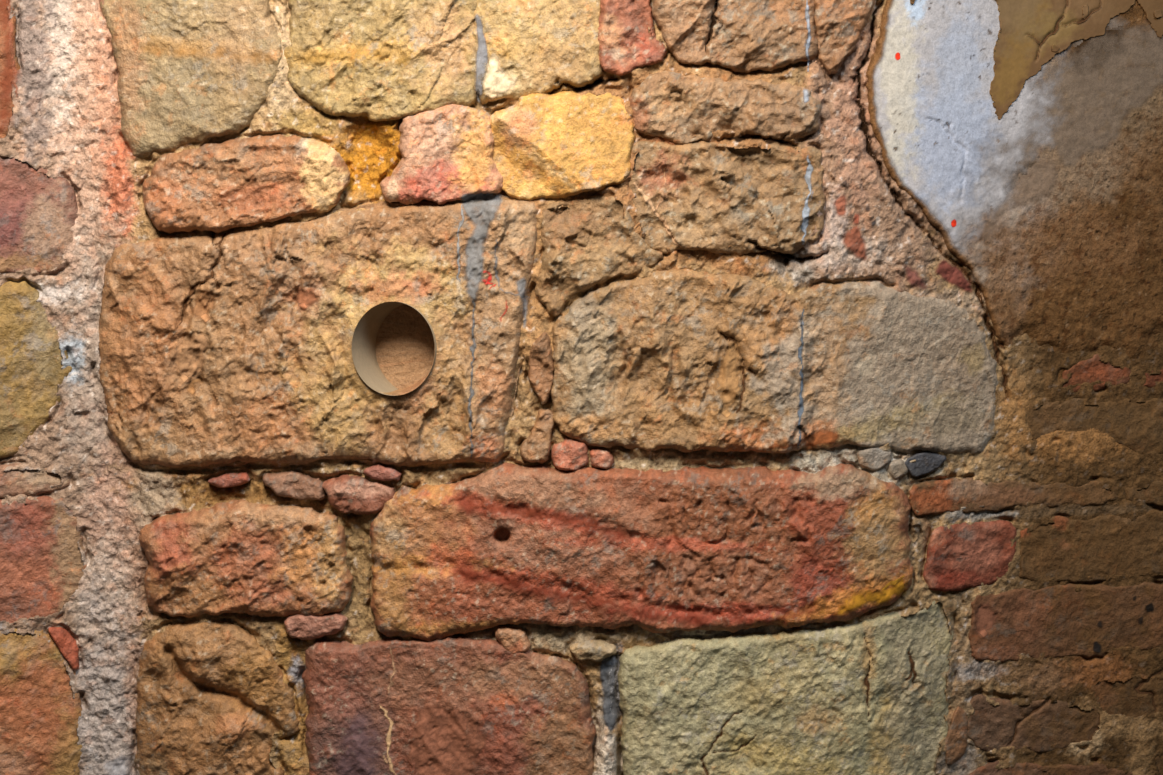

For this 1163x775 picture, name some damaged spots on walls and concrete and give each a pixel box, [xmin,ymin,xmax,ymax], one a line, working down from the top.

peeling [874,0,1163,247]
crack [700,712,756,775]